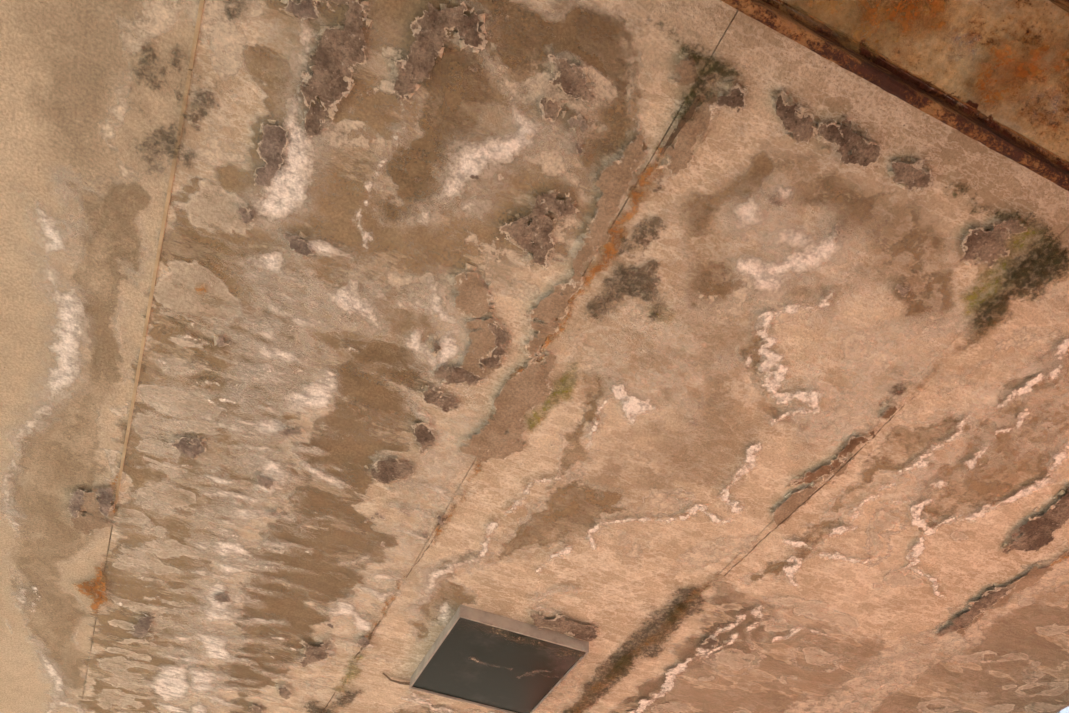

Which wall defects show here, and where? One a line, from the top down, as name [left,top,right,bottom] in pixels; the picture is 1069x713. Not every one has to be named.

water stain [3,209,95,529]
spalling [279,0,372,137]
water stain [35,0,647,713]
peeling [364,263,512,485]
spalling [496,189,579,269]
water stain [689,176,977,440]
spalling [771,87,934,193]
rust [73,566,108,613]
crack [354,621,381,659]
crack [382,673,410,685]
water stain [564,328,1069,713]
crack [724,396,915,576]